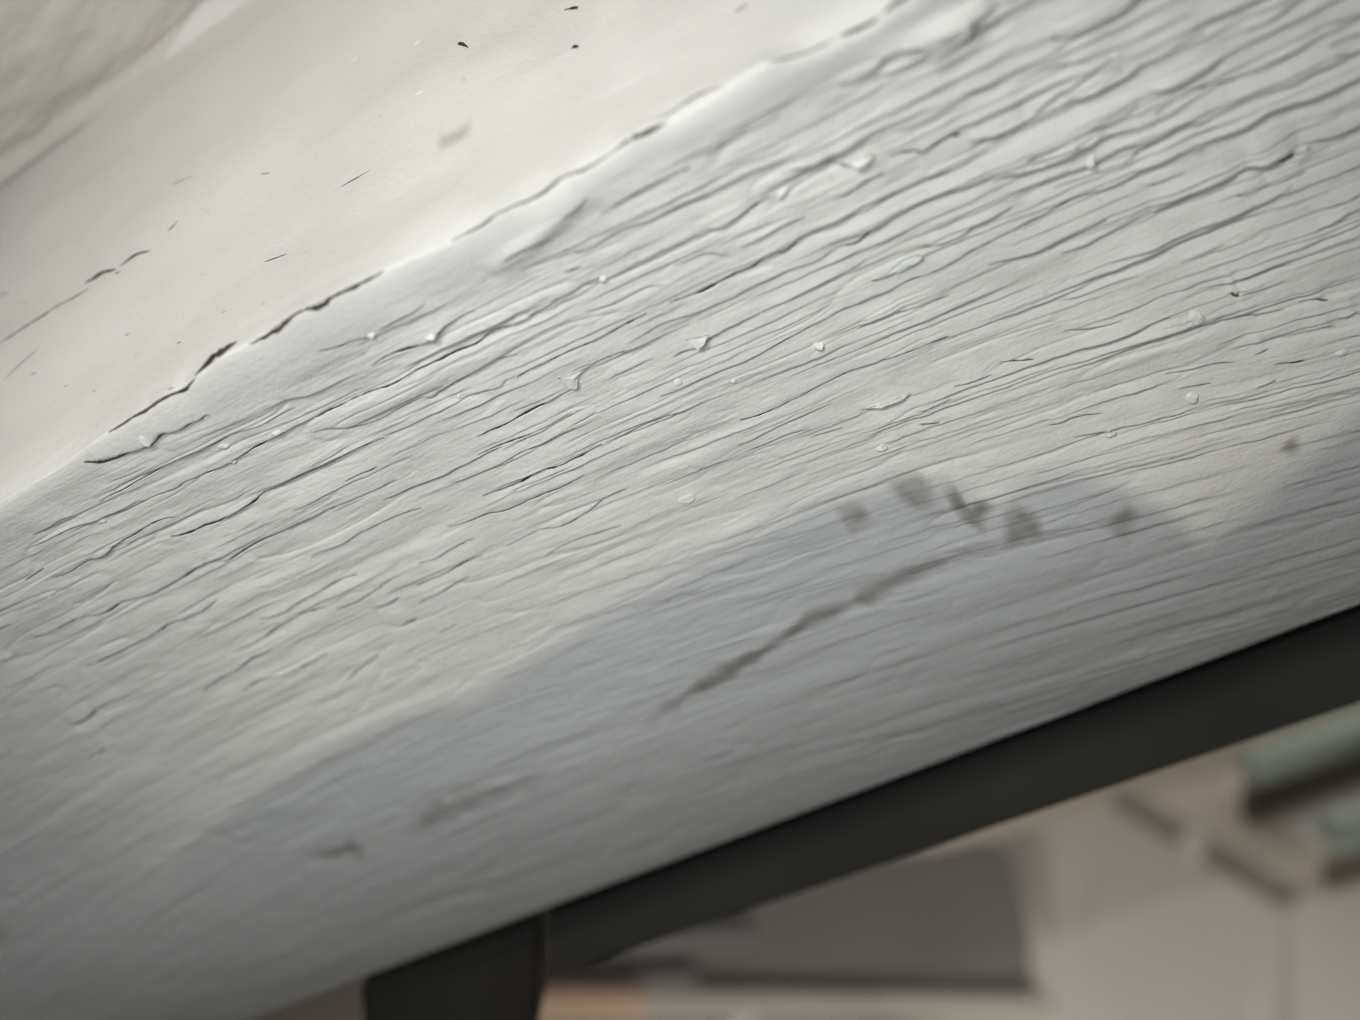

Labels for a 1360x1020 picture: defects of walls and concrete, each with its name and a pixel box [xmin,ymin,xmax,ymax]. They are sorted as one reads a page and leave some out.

crack [768,0,905,62]
crack [0,15,1360,692]
crack [71,696,125,726]